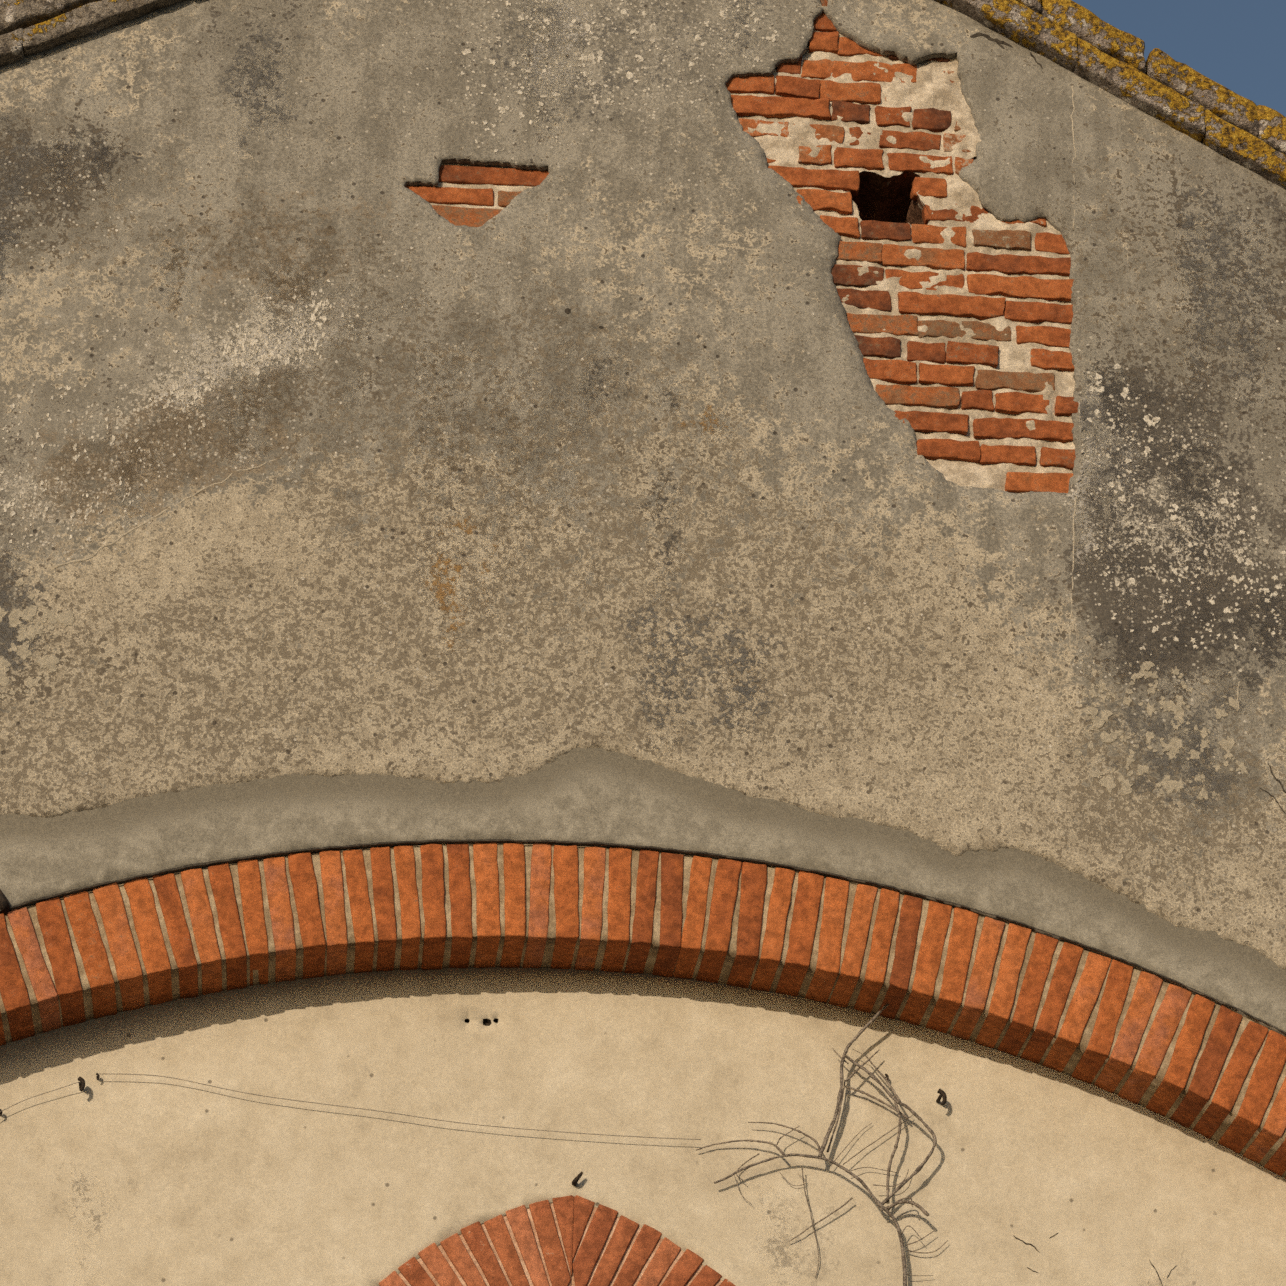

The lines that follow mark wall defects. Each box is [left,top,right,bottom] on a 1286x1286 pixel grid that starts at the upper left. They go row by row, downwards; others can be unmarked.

water stain [0,107,141,294]
water stain [1174,188,1283,378]
spalling [405,0,1286,812]
water stain [0,557,47,674]
water stain [1068,366,1286,809]